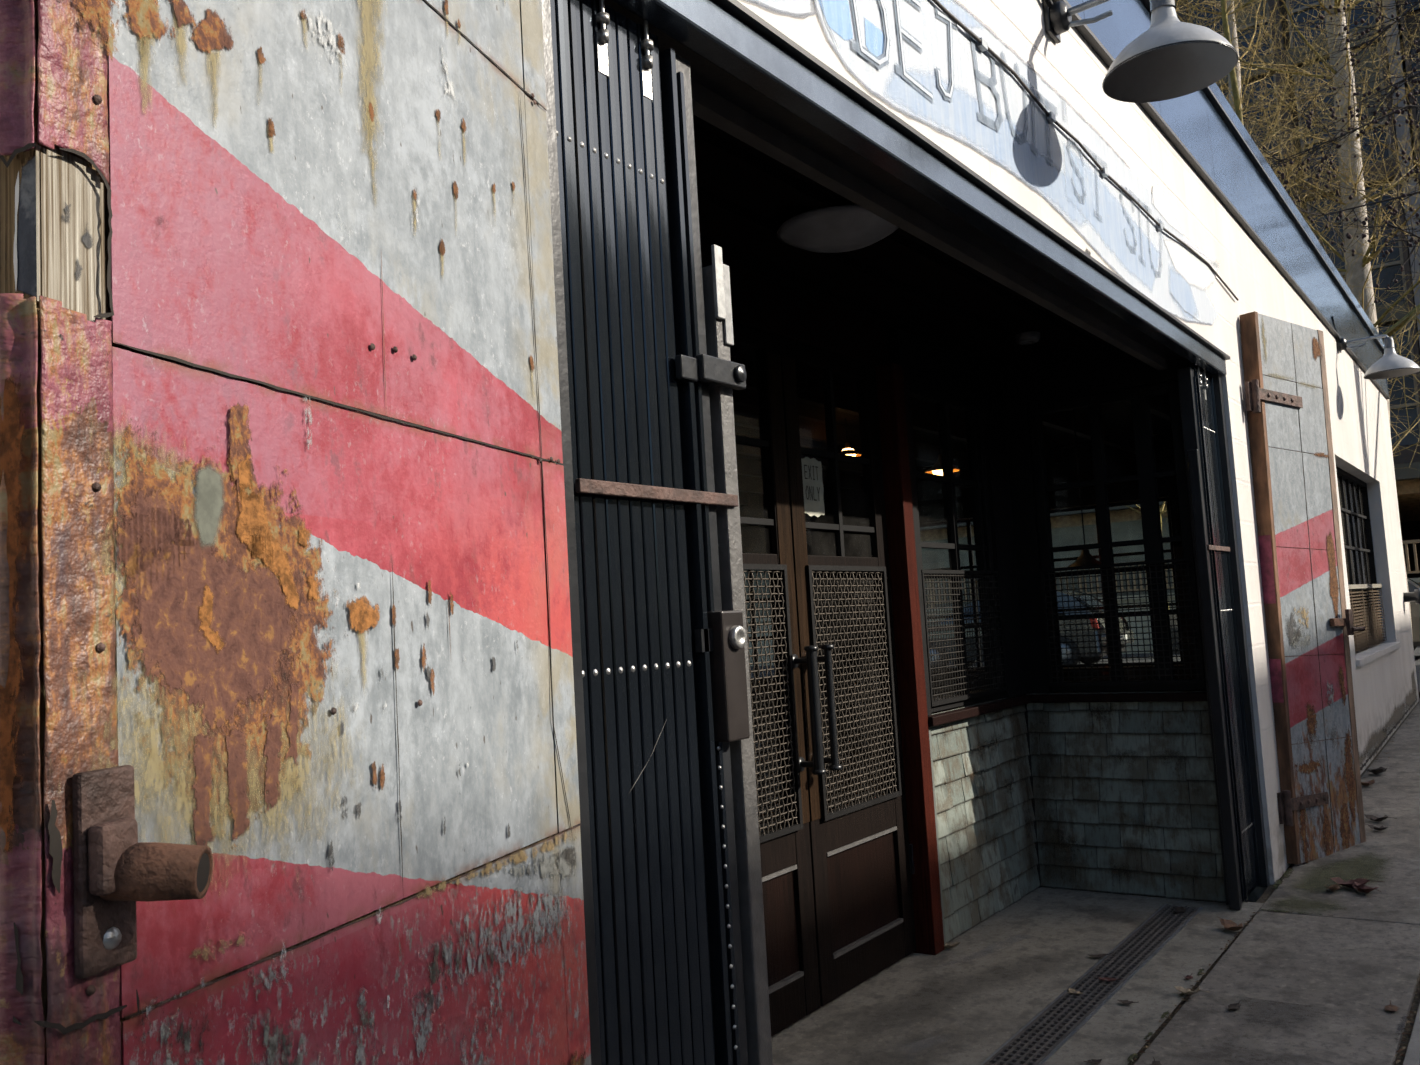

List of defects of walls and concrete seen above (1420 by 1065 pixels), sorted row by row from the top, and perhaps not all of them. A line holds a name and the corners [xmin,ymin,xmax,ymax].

corrosion [62,0,234,119]
corrosion [257,46,266,82]
corrosion [268,119,276,151]
corrosion [0,374,27,852]
corrosion [90,403,380,854]
peeling [421,644,435,695]
peeling [372,761,385,790]
corrosion [1299,728,1356,865]
peeling [411,824,576,1065]
peeling [141,980,208,1065]
peeling [248,945,320,1065]
peeling [336,988,390,1065]